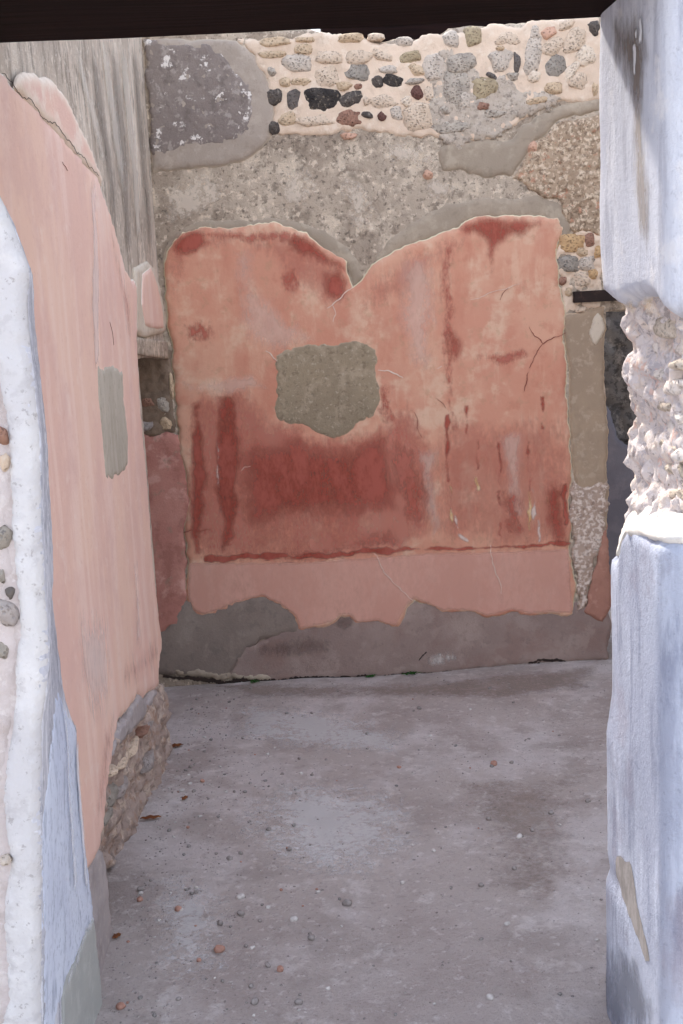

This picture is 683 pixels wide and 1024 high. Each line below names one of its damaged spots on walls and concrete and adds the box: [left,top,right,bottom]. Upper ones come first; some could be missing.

flaking render [238,17,600,141]
spalling [556,231,605,345]
crack [524,327,565,391]
flaking render [88,480,612,976]
spalling [616,856,649,961]